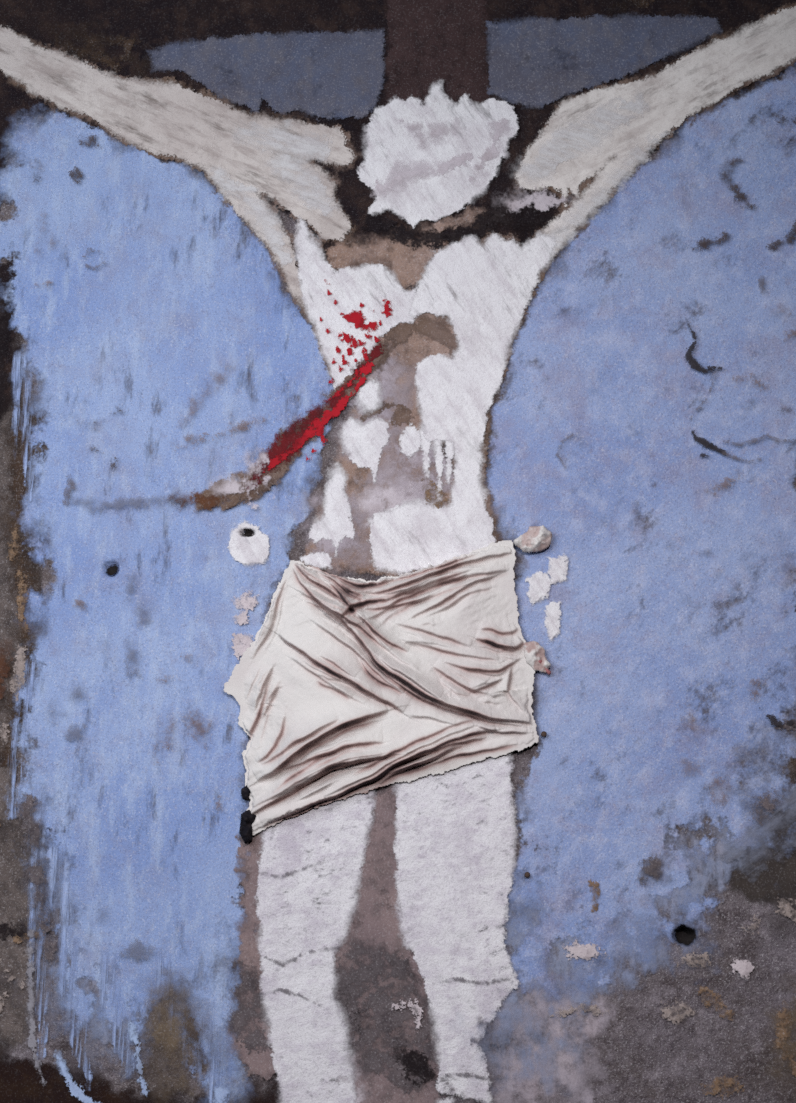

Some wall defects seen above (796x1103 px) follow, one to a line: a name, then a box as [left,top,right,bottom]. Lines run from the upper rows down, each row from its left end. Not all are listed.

crack [685,323,796,462]
peeling [637,853,662,885]
spalling [588,879,601,912]
spalling [775,897,796,922]
spalling [562,939,606,960]
spalling [677,952,711,967]
spalling [730,959,755,979]
spalling [660,986,734,1025]
peeling [470,1013,509,1057]